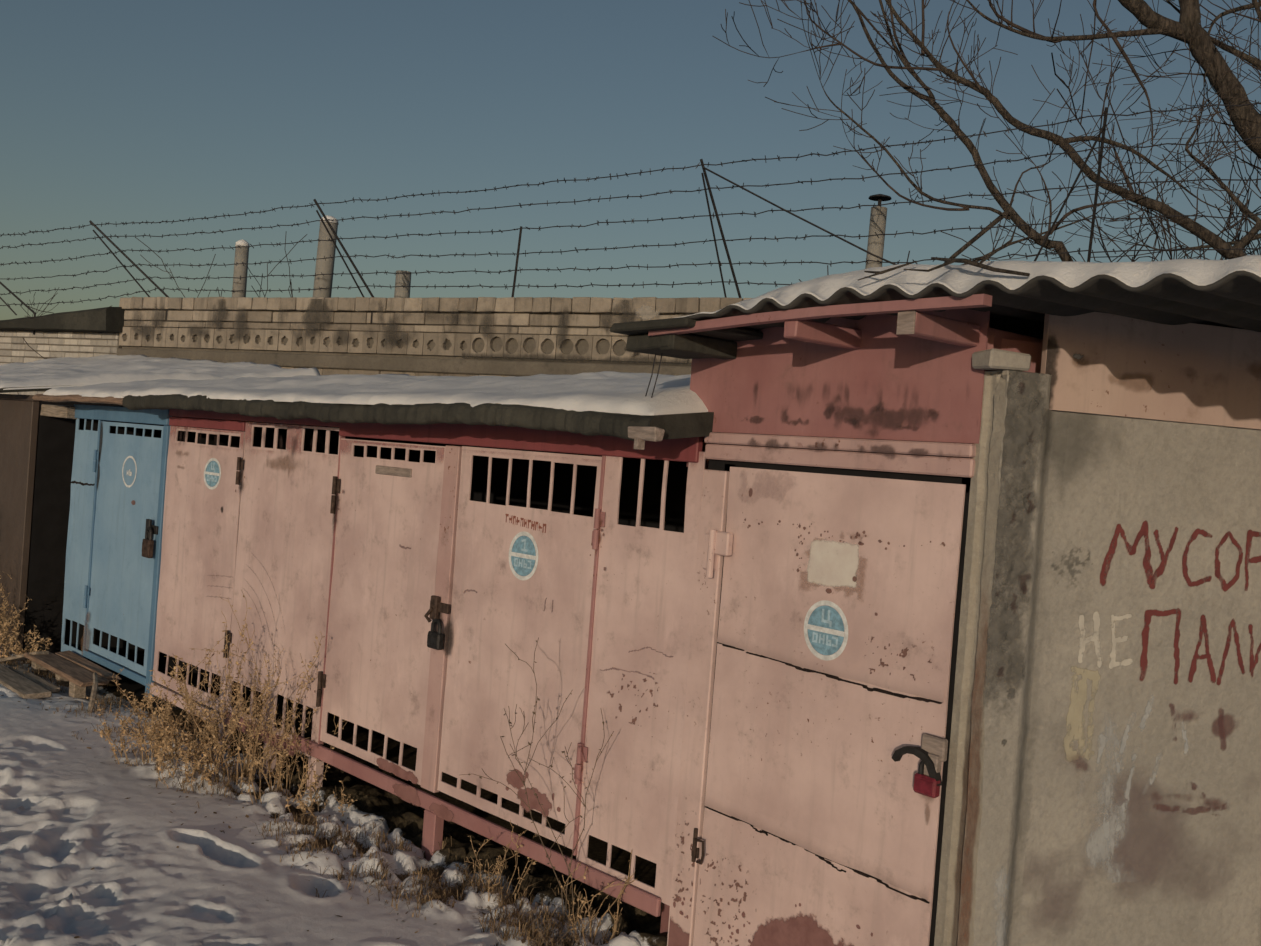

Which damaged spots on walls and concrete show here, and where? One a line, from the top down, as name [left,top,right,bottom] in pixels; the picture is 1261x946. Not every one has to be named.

corrosion [743,519,905,572]
corrosion [608,673,658,725]
crack [717,642,942,704]
corrosion [869,637,929,683]
peeling [506,769,560,818]
crack [705,806,930,904]
corrosion [673,823,748,946]
peeling [728,903,854,946]